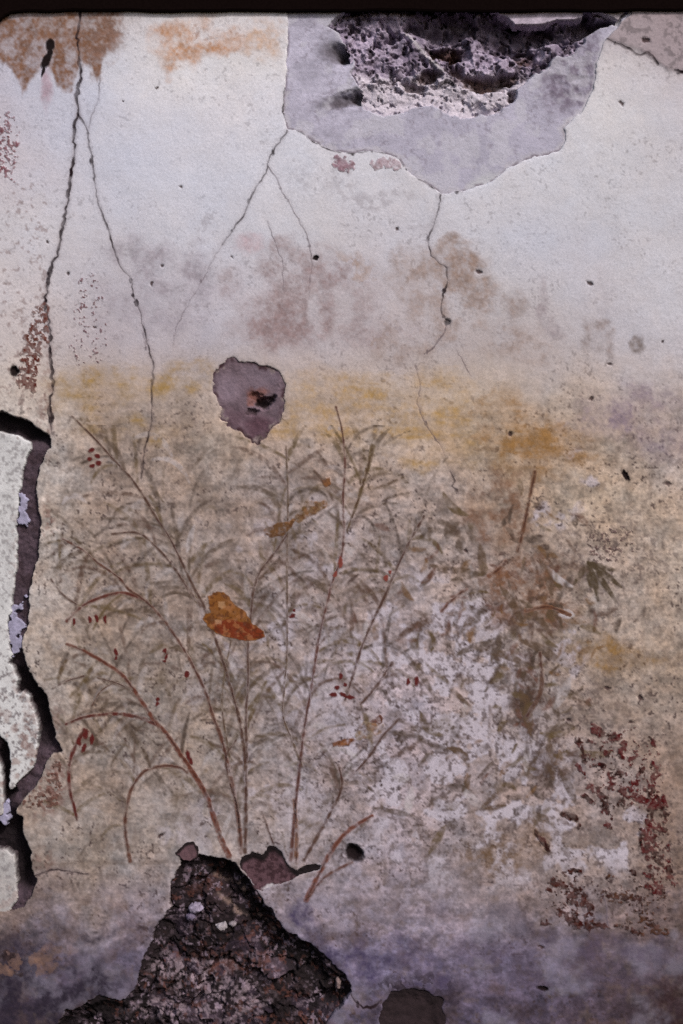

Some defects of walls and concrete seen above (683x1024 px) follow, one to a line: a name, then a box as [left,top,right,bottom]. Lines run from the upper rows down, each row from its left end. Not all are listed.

leakage [0,11,130,119]
flaking render [284,11,631,194]
flaking render [213,357,286,445]
crack [0,12,472,910]
peeling [22,760,64,809]
flaking render [59,841,351,1024]
flaking render [379,989,446,1024]